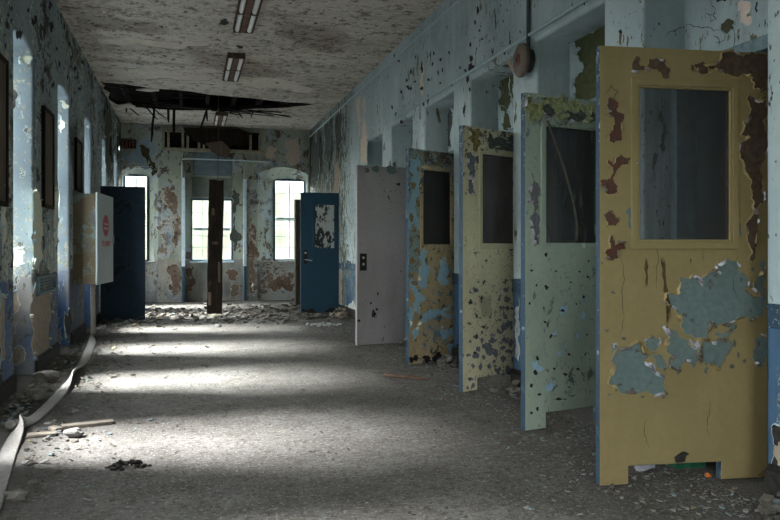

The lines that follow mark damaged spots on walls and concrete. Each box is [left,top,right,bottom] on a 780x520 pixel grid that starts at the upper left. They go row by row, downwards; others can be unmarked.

peeling [523,22,622,125]
peeling [0,182,72,369]
peeling [145,185,196,298]
spalling [104,83,292,180]
peeling [230,188,294,292]
peeling [400,158,459,355]
peeling [599,154,639,195]
peeling [600,207,640,265]
peeling [606,49,768,399]